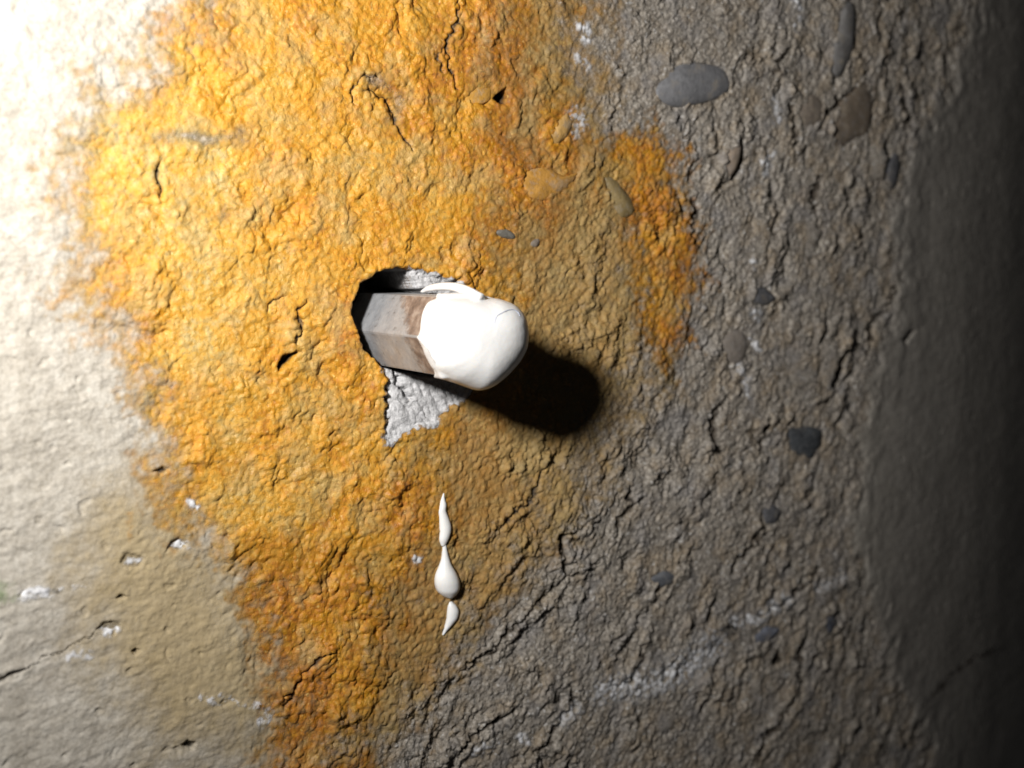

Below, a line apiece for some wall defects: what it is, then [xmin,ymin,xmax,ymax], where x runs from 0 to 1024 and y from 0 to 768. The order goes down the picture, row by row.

spalling [159,129,243,145]
crack [350,75,409,144]
rust [64,0,707,768]
spalling [327,0,976,768]
damp [439,493,451,546]